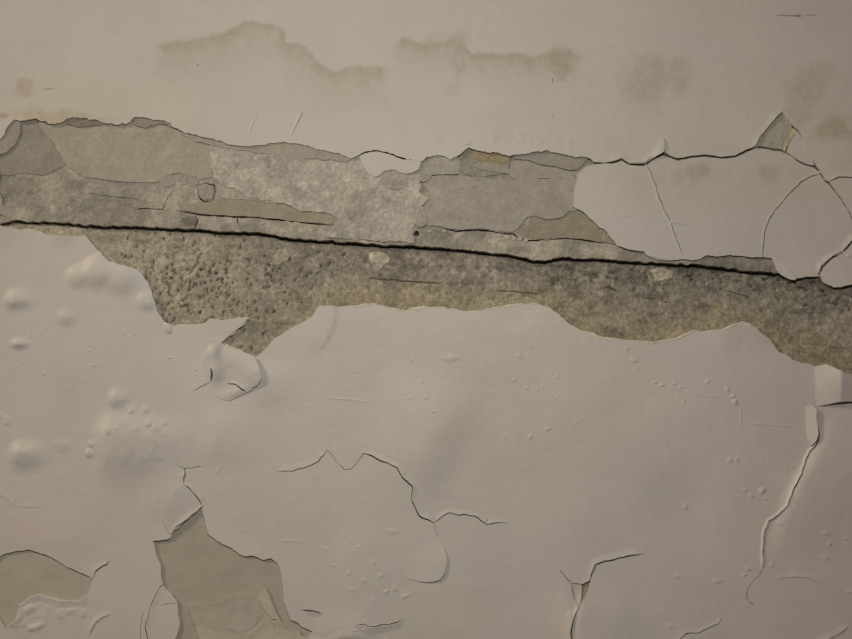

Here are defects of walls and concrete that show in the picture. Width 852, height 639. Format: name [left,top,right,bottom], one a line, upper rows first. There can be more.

flaking render [0,113,852,445]
crack [609,148,755,255]
crack [760,164,852,258]
crack [817,241,852,275]
crack [277,449,508,535]
crack [759,429,820,571]
peeling [0,550,102,634]
peeling [151,497,368,639]
crack [560,606,579,639]
crack [561,548,644,582]